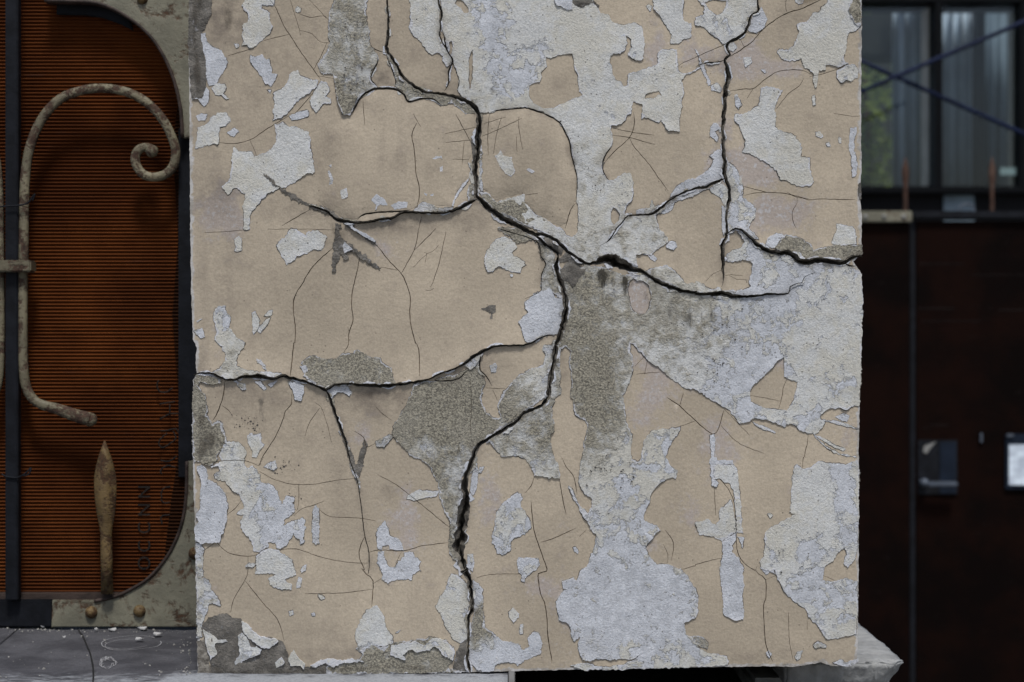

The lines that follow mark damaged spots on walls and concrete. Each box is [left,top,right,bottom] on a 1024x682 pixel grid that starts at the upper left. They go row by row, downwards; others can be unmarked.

peeling [187,0,864,674]
crack [193,0,862,673]